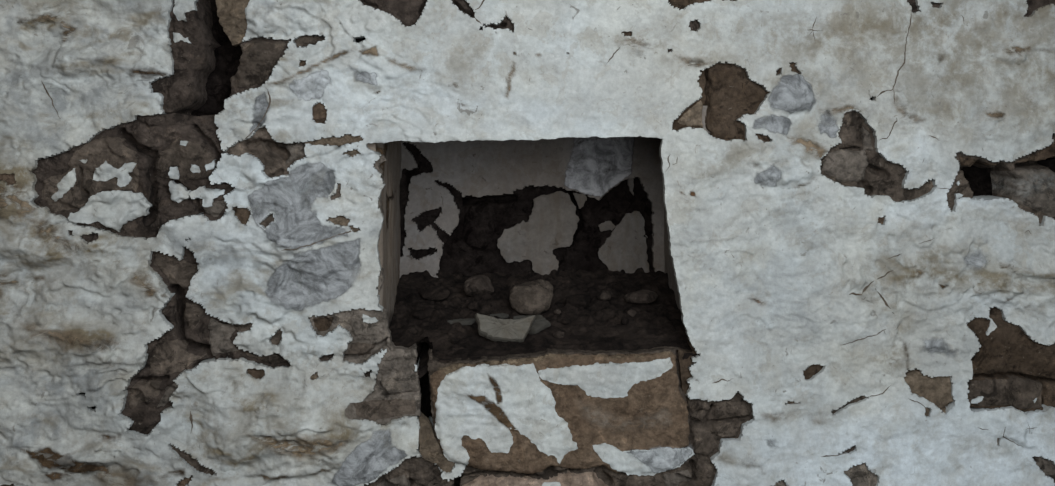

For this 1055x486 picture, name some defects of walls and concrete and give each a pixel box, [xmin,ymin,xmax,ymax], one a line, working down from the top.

crack [875,15,912,140]
flaking render [672,63,934,202]
flaking render [947,135,1055,225]
flaking render [32,0,753,486]
flaking render [904,368,953,416]
flaking render [967,307,1055,412]
flaking render [1032,456,1055,486]